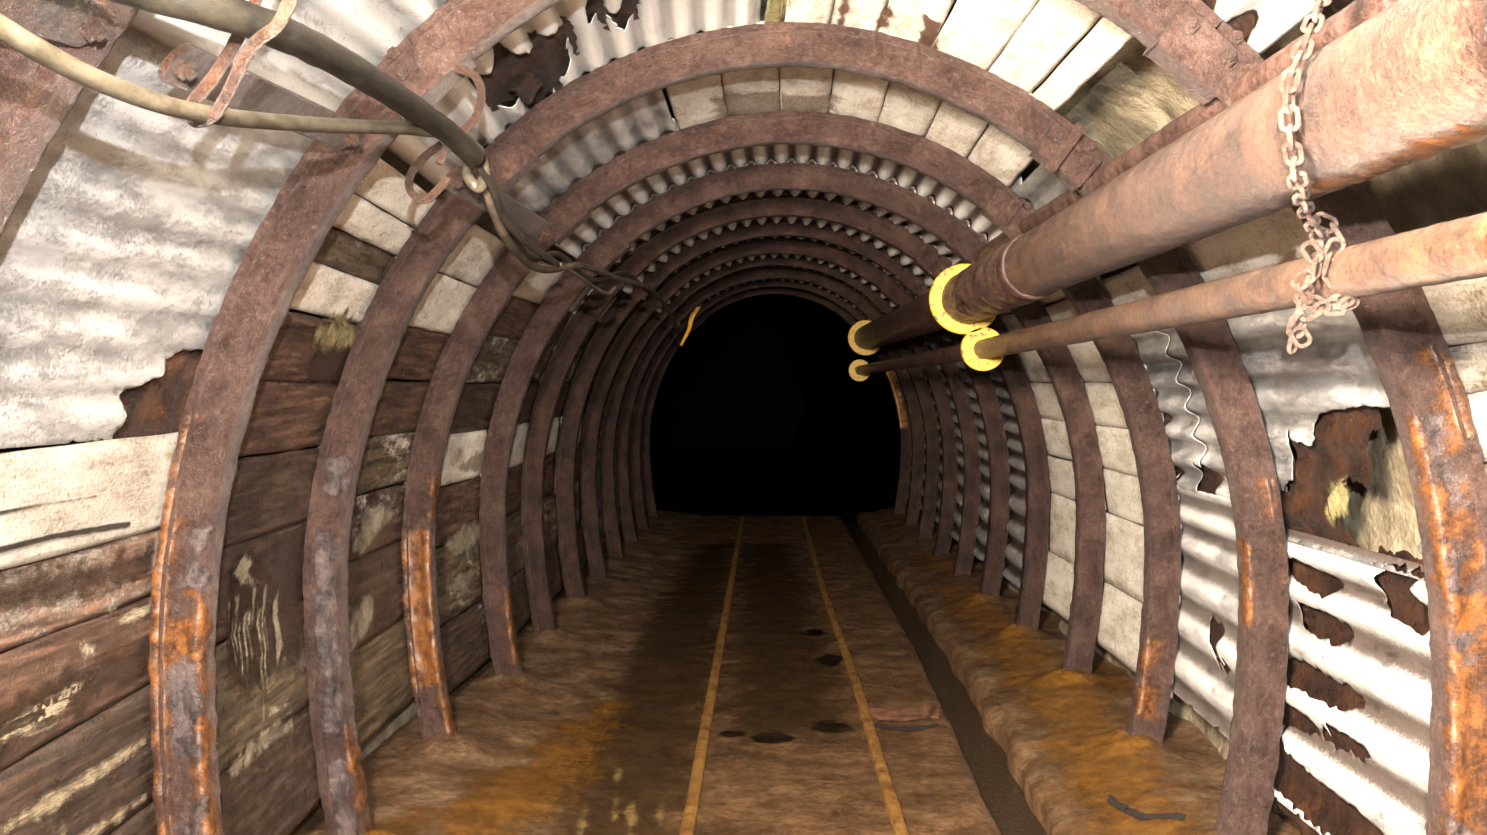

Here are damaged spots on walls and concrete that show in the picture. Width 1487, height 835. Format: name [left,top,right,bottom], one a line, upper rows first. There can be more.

corrosion [148,415,222,835]
corrosion [401,478,455,736]
corrosion [1406,345,1487,835]